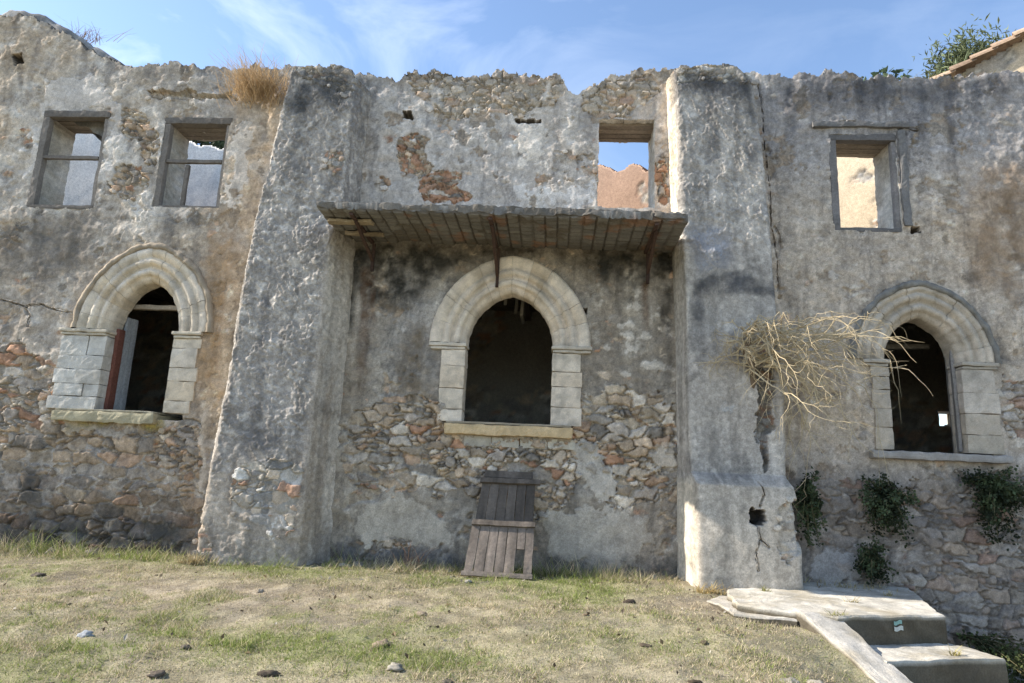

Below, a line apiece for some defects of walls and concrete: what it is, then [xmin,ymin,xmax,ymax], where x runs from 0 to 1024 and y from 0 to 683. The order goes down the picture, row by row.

flaking render [22,72,254,222]
spalling [397,70,598,209]
crack [758,86,782,299]
crack [0,298,72,327]
spalling [153,424,203,476]
spalling [230,456,304,540]
flaking render [539,435,656,572]
flaking render [643,441,678,474]
crack [750,365,776,571]
flaking render [808,544,863,584]